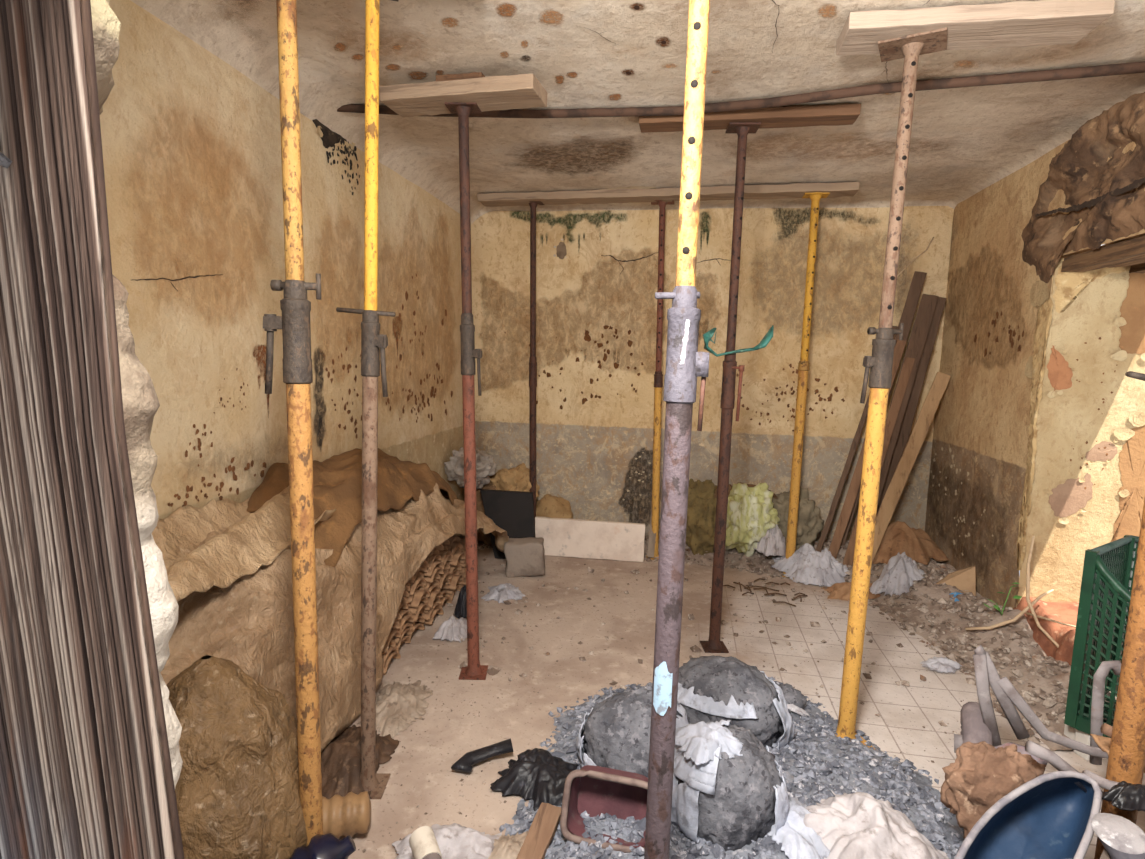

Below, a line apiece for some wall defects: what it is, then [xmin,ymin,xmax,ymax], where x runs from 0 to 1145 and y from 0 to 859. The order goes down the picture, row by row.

spalling [312,119,355,149]
water stain [518,141,632,173]
water stain [511,211,626,245]
water stain [774,207,872,238]
crack [133,274,223,291]
water stain [974,311,1024,357]
peeling [1017,92,1145,570]